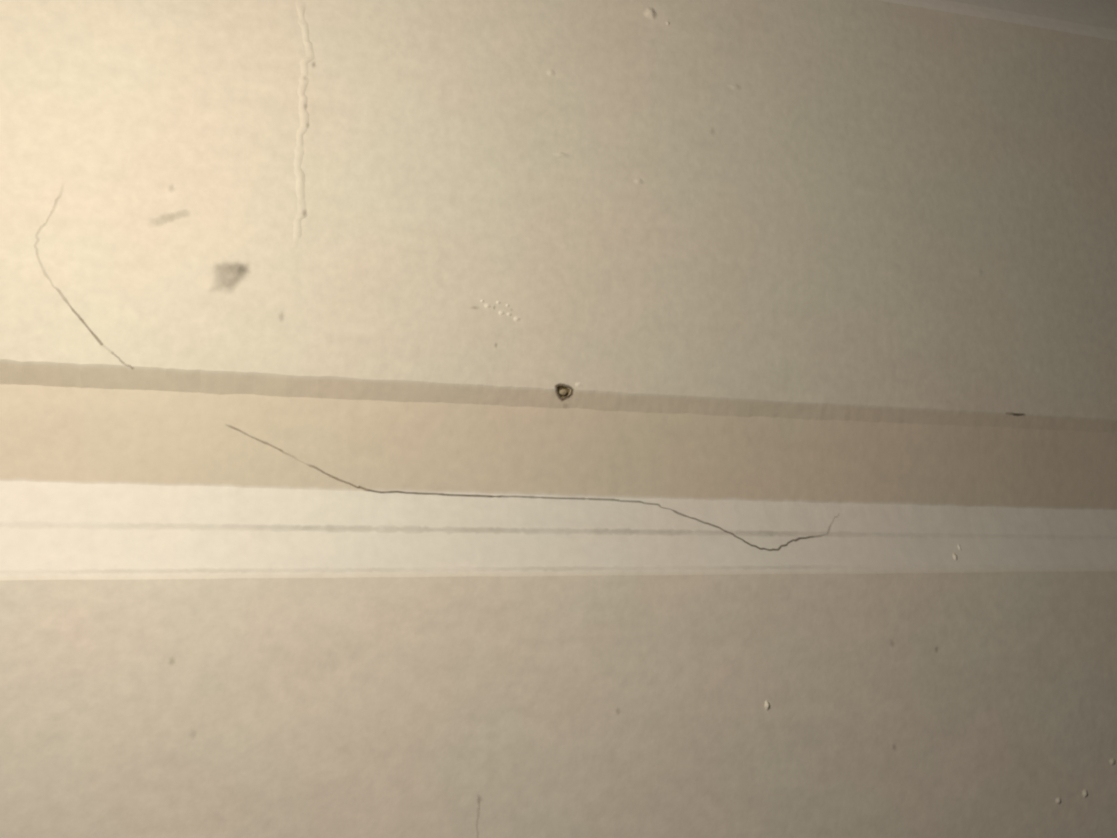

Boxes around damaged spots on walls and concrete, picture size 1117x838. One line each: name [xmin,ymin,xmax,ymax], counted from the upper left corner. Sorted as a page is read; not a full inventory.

crack [367,489,501,497]
crack [718,527,809,551]